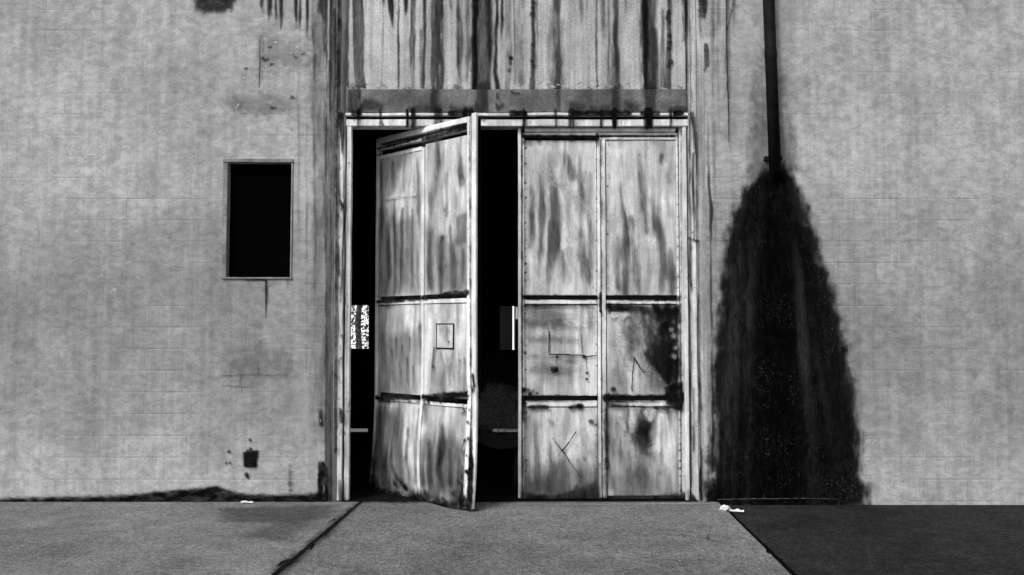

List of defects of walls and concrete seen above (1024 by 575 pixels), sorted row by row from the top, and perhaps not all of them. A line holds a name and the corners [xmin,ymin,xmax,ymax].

damp [194,0,235,13]
damp [388,0,515,119]
damp [521,0,537,90]
damp [553,0,562,89]
damp [595,0,620,108]
damp [640,0,688,111]
damp [674,101,870,505]